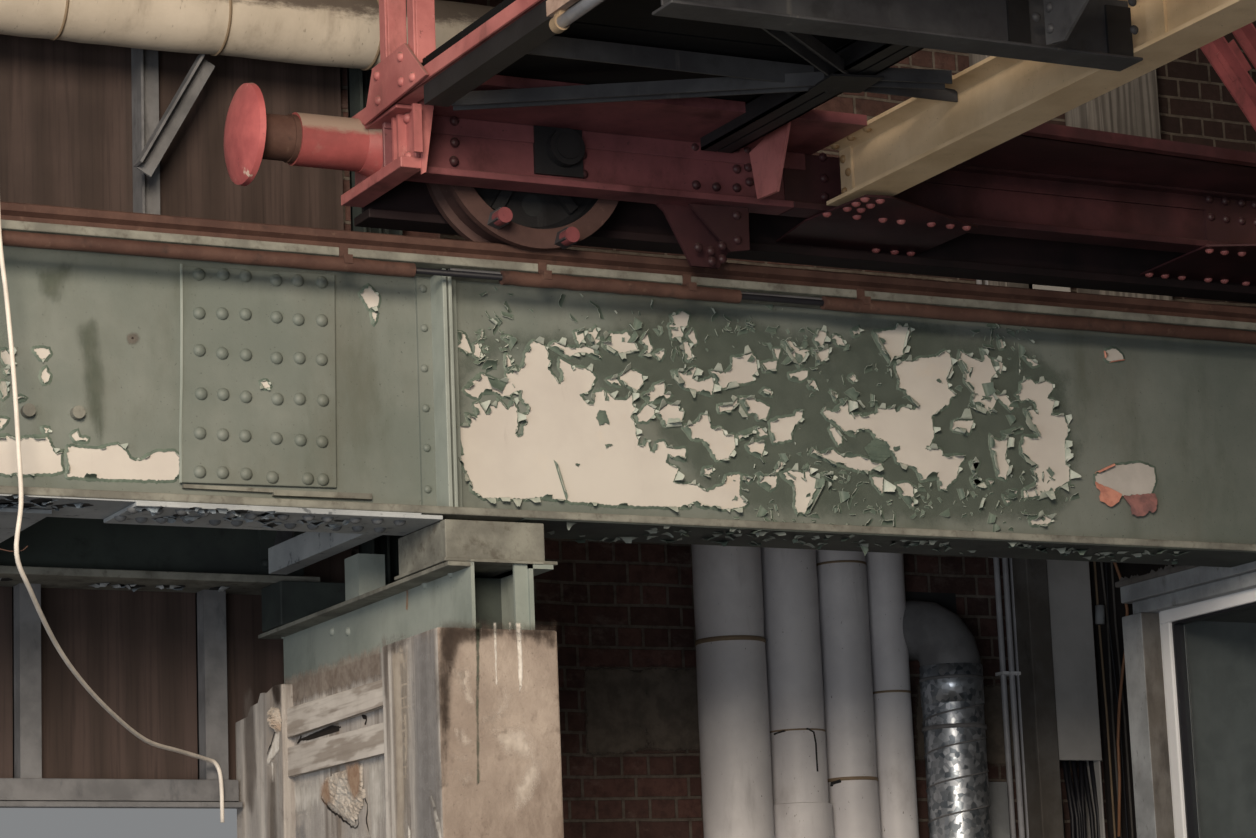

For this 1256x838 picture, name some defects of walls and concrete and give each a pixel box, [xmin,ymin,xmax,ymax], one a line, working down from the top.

peeling [258,378,273,391]
peeling [0,345,179,484]
peeling [456,309,1157,554]
peeling [0,495,94,511]
peeling [134,506,350,530]
peeling [1004,542,1187,564]
spalling [325,763,366,826]